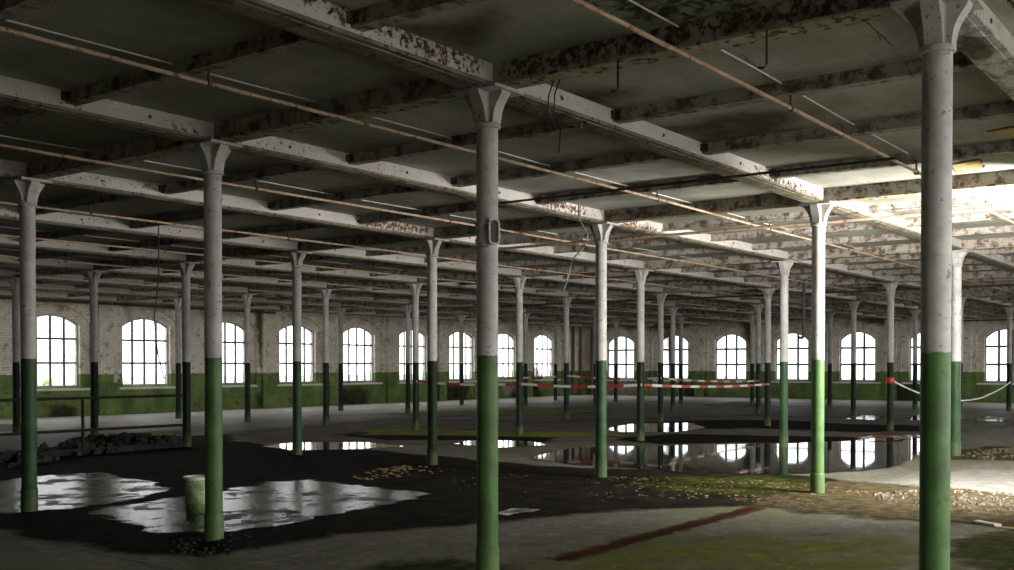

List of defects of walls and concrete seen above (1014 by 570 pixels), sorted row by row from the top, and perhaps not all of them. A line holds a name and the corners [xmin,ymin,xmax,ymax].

rust [302,0,362,35]
leakage [587,0,757,23]
rust [374,25,483,75]